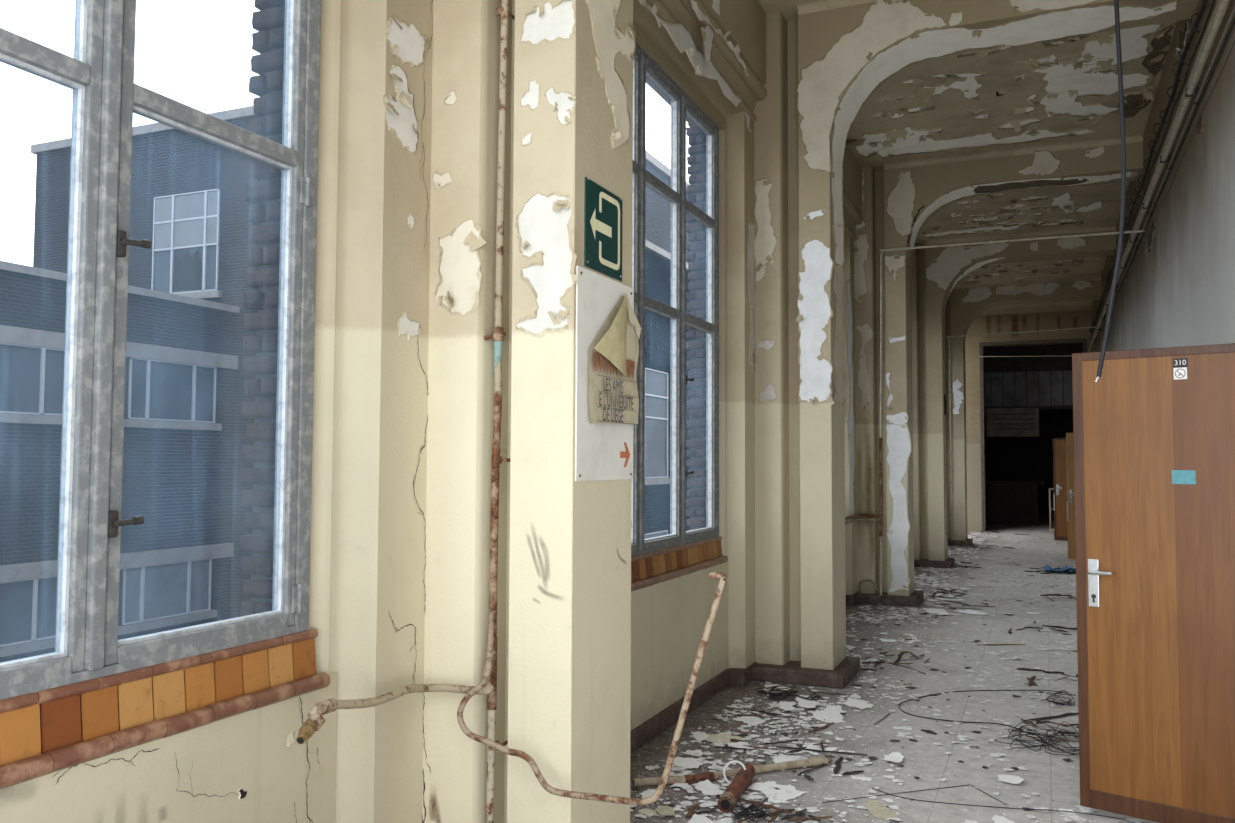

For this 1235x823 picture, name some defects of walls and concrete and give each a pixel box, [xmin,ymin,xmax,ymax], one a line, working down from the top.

peeling [383,15,433,155]
peeling [519,0,636,150]
peeling [688,0,750,77]
peeling [434,219,486,316]
peeling [515,190,577,338]
peeling [754,177,779,282]
peeling [795,0,1190,593]
crack [54,748,234,797]
crack [294,696,320,823]